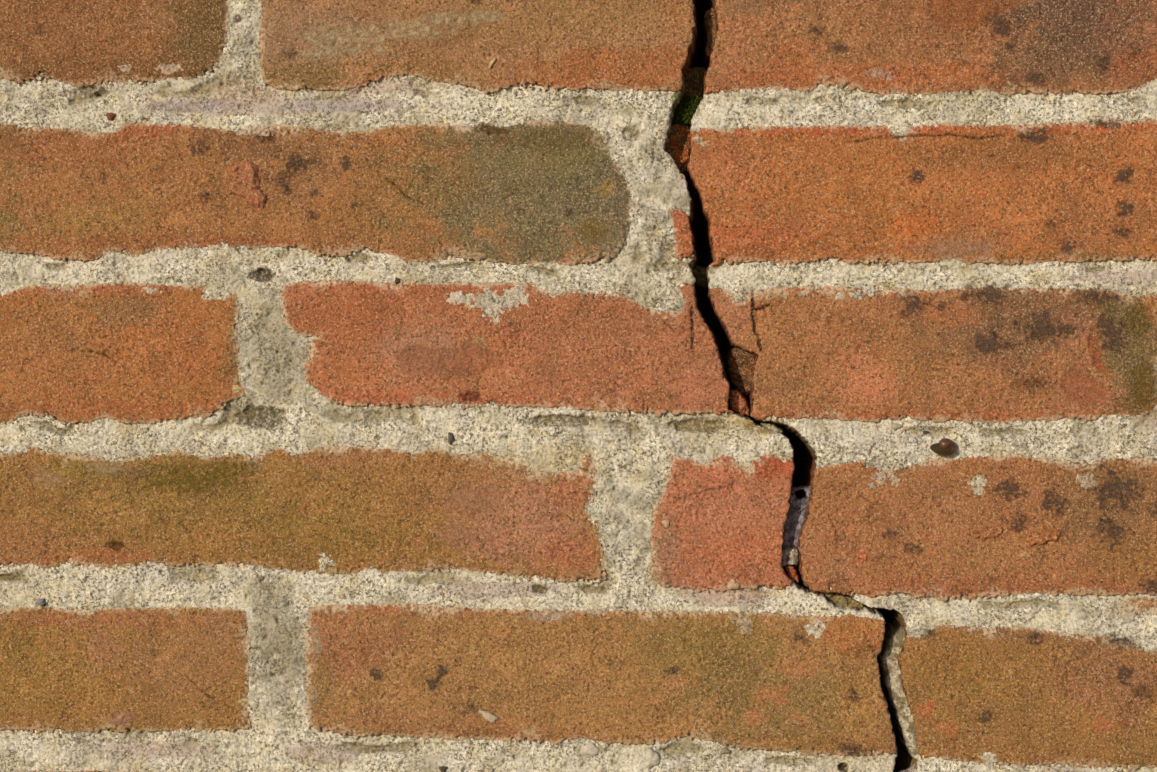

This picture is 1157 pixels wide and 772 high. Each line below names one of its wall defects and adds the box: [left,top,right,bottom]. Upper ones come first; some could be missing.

crack [652,0,920,772]